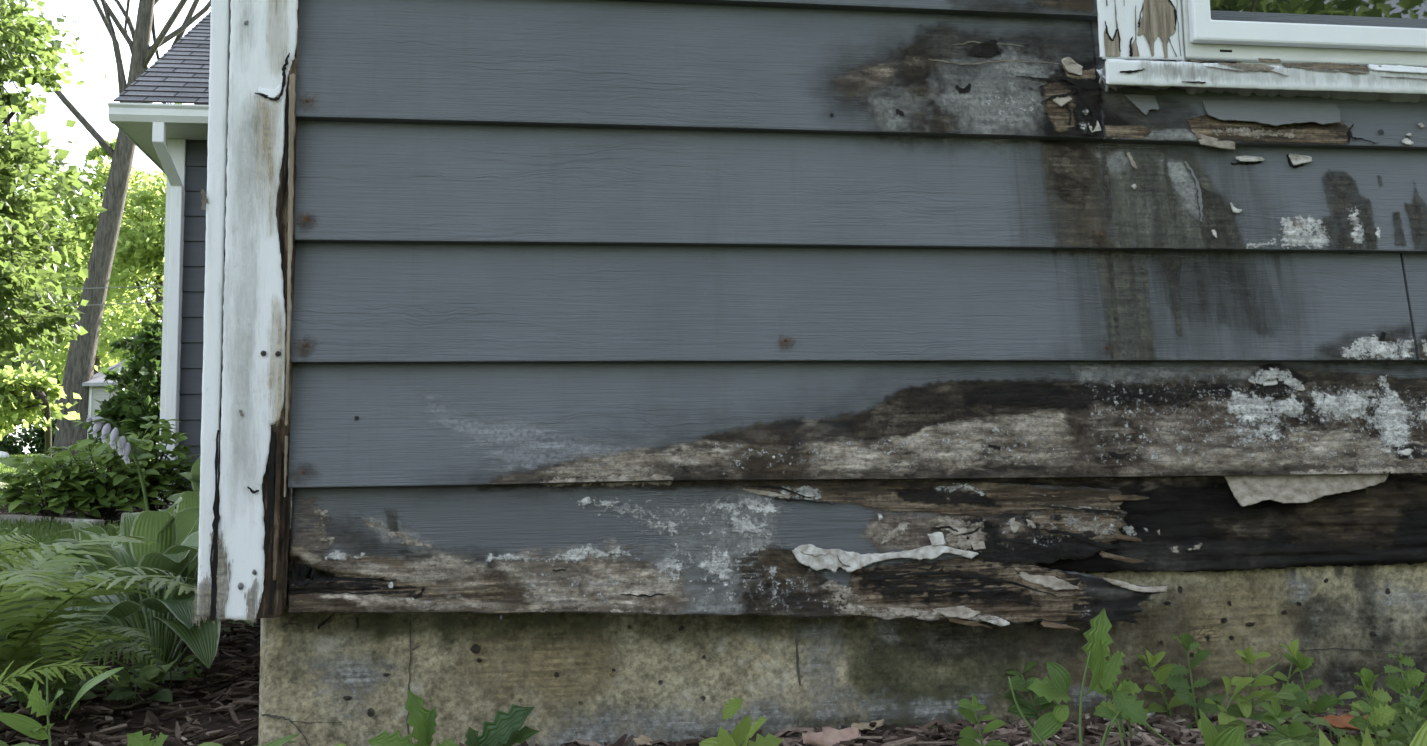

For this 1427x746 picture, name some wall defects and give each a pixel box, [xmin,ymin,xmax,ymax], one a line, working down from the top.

damp [972,0,1095,15]
peeling [1061,57,1083,76]
peeling [1104,0,1177,74]
peeling [1182,58,1427,168]
damp [481,26,1427,672]
peeling [1248,364,1308,398]
peeling [1224,474,1389,507]
peeling [792,511,988,573]
spalling [474,544,689,631]
damp [478,632,609,701]
damp [879,566,1427,725]
damp [549,701,793,746]